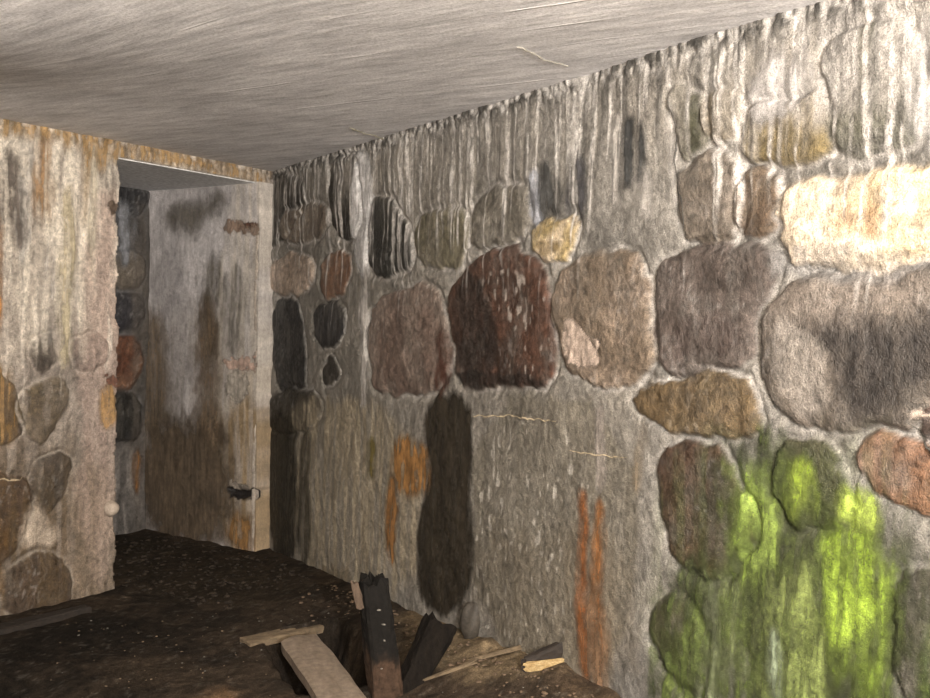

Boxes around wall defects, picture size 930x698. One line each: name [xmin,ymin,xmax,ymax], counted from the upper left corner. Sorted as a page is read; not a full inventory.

rust [3,119,214,215]
leakage [167,192,224,233]
leakage [144,260,241,542]
rust [386,436,426,564]
rust [577,493,608,687]